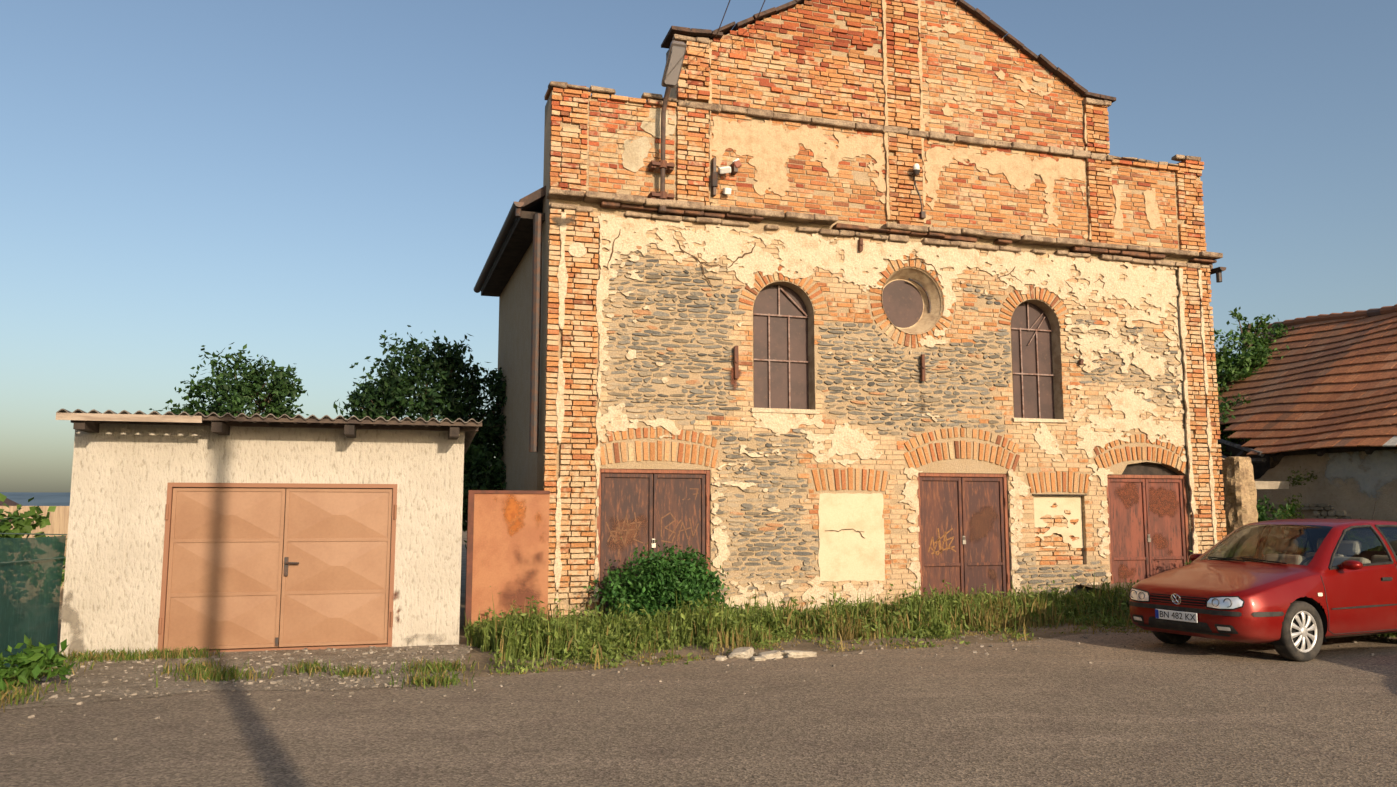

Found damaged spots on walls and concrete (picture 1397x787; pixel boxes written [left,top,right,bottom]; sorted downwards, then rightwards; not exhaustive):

peeling [921,14,973,45]
peeling [990,50,1065,117]
peeling [711,116,886,204]
peeling [923,141,1086,227]
spalling [960,281,1006,310]
spalling [816,322,1012,440]
spalling [1063,304,1182,409]
spalling [601,244,820,611]
peeling [1325,450,1397,498]
corrosion [504,495,540,535]
corrosion [503,555,540,620]
spalling [1015,553,1108,598]